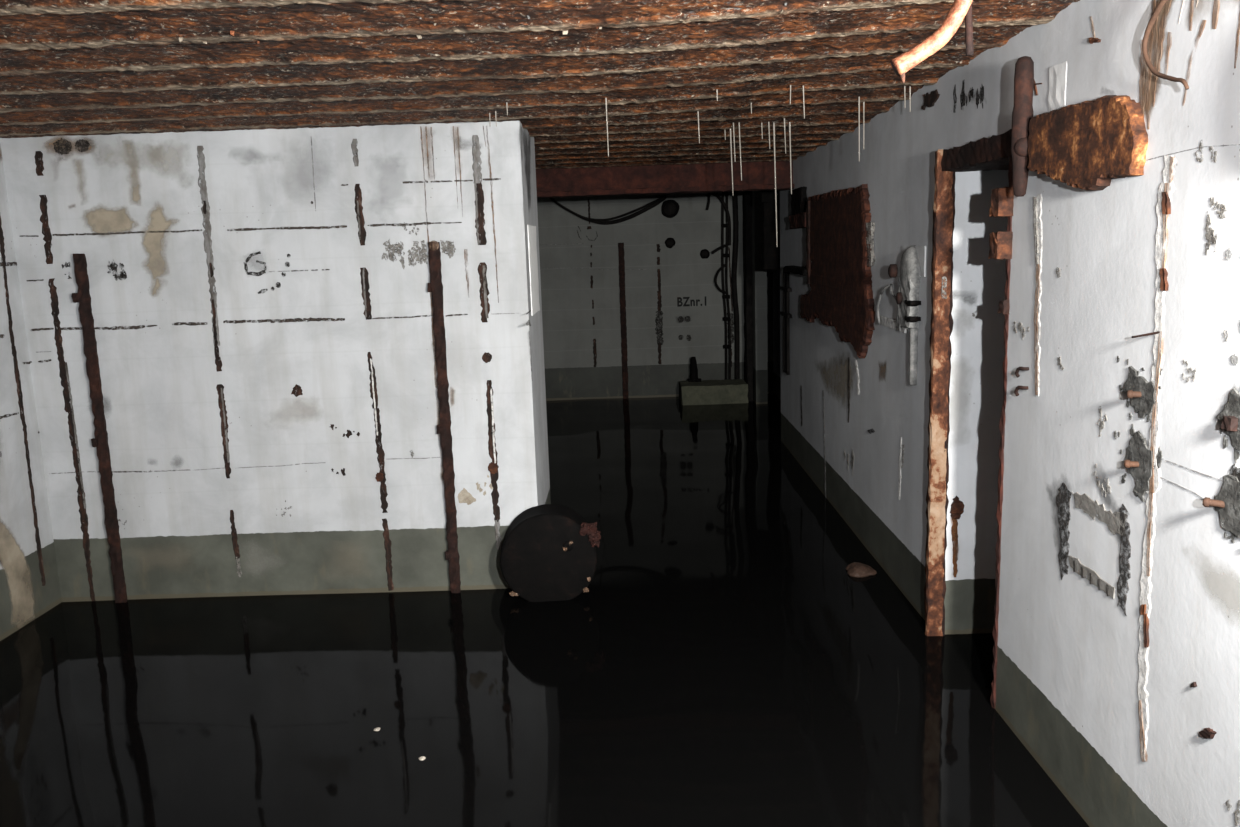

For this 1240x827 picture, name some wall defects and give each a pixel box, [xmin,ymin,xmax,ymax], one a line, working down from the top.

water stain [73,143,174,295]
rust [420,126,437,386]
water stain [0,521,35,627]
rust [950,496,964,577]